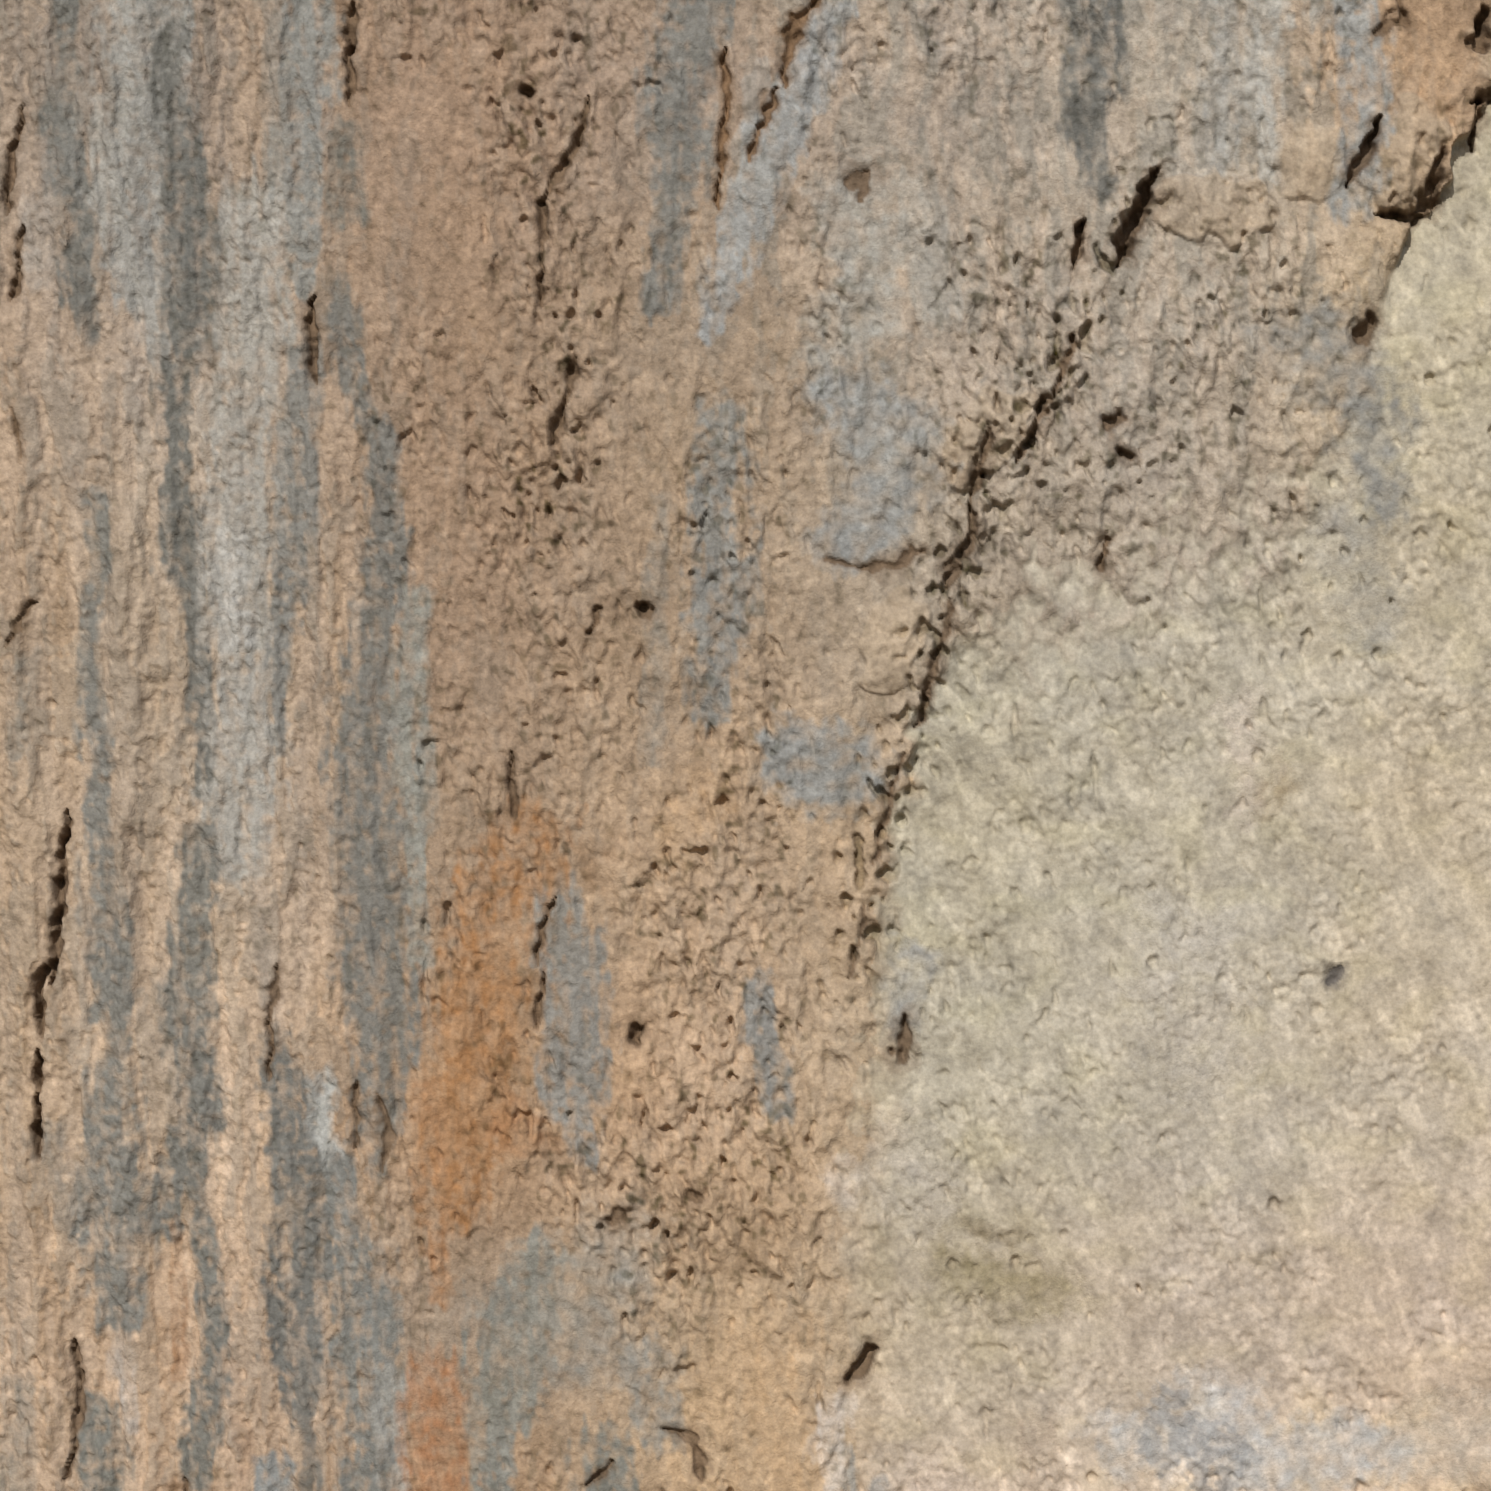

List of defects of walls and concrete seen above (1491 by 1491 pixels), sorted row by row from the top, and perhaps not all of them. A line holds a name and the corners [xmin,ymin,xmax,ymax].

crack [0,104,31,306]
peeling [731,55,773,167]
crack [708,0,828,211]
crack [1066,157,1179,280]
spalling [1449,0,1491,81]
crack [869,328,1088,868]
spalling [820,89,1491,1491]
crack [19,806,86,1165]
corrosion [401,736,743,1315]
crack [842,905,874,981]
crack [58,1336,94,1483]
corrosion [389,1333,482,1491]